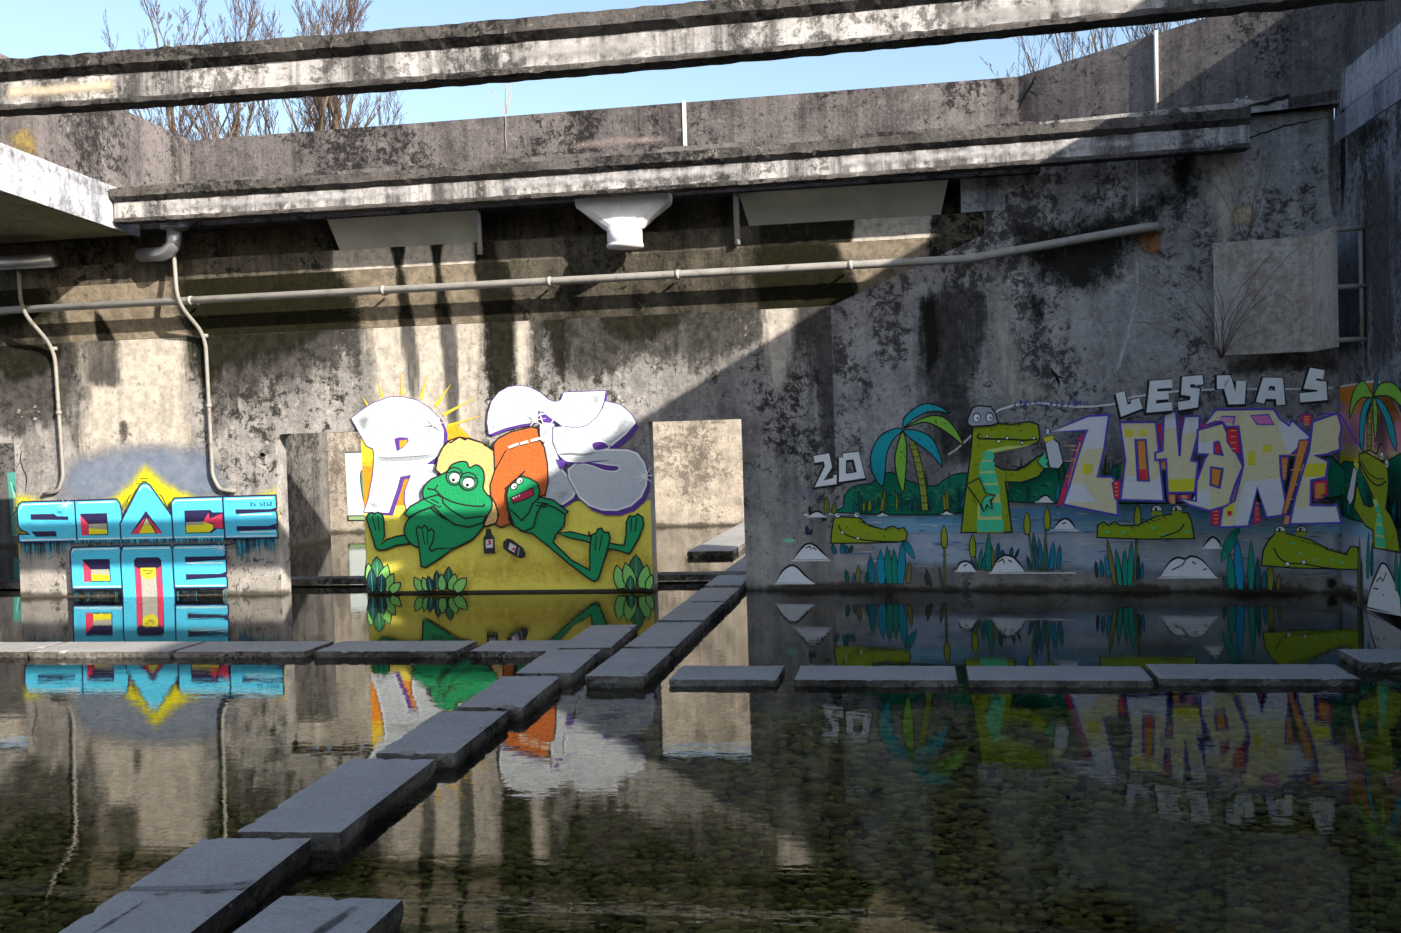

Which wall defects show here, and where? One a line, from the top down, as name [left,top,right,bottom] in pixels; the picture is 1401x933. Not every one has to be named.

damp [830,215,932,293]
damp [842,135,1254,242]
damp [1328,104,1398,365]
damp [0,241,836,479]
damp [917,280,1051,463]